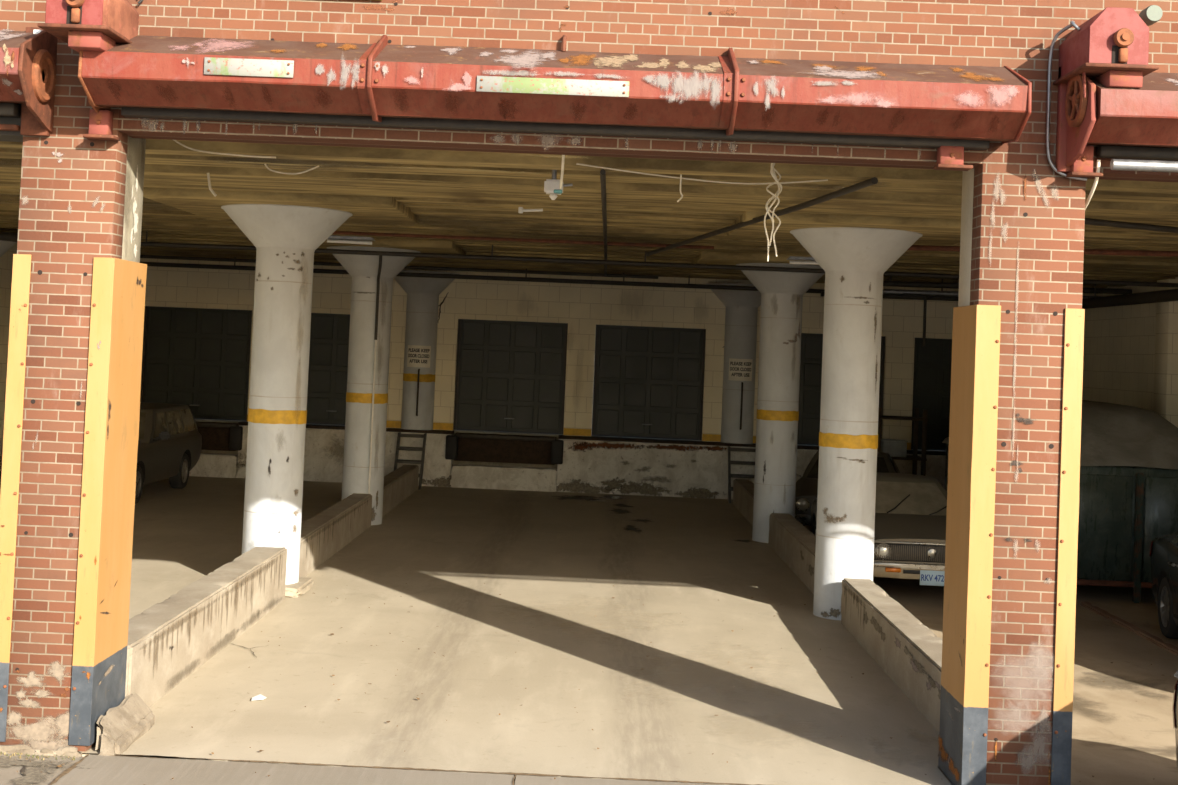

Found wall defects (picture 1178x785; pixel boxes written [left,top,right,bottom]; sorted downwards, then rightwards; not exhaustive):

peeling [315,43,359,86]
peeling [480,50,721,102]
peeling [813,64,892,107]
rust [568,442,726,452]
spalling [864,612,941,699]
spalling [16,661,69,698]